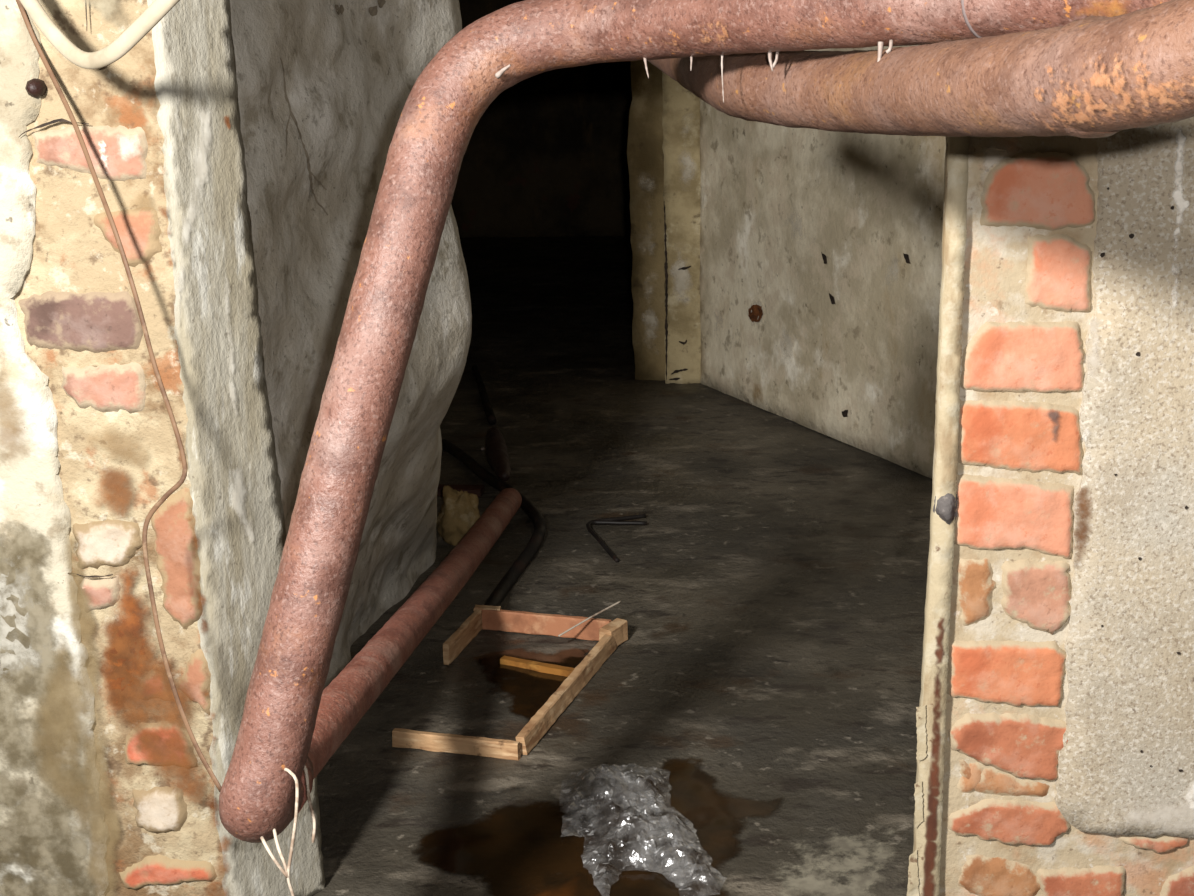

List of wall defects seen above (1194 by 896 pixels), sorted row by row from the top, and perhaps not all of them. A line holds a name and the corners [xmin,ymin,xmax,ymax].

spalling [38,0,148,52]
spalling [13,21,225,896]
spalling [940,135,1194,896]
leakage [0,525,97,896]
peeling [907,849,919,896]
peeling [914,781,923,829]
peeling [916,704,927,762]
corrosion [923,619,944,896]